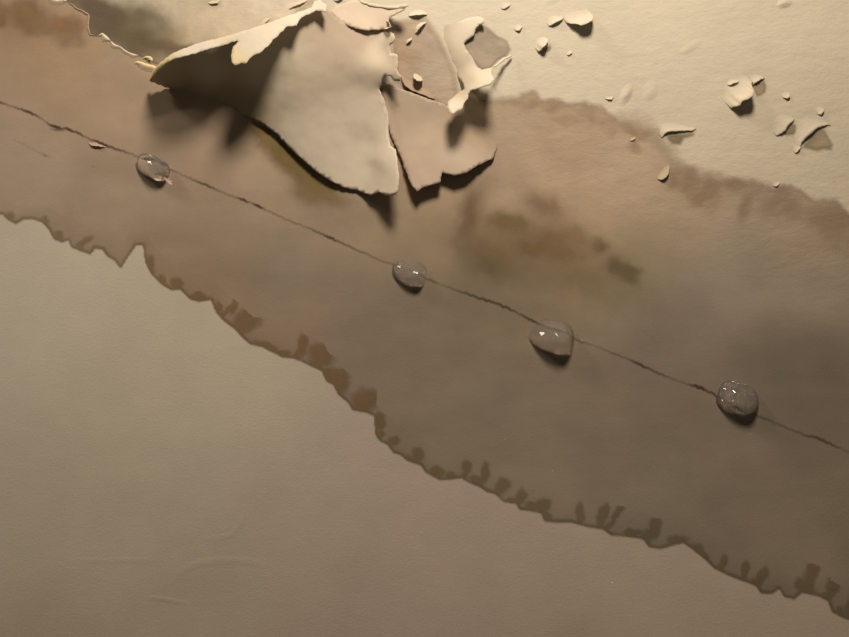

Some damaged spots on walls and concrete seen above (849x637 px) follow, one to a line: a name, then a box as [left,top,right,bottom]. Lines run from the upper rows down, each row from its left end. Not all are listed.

peeling [48,0,513,196]
peeling [724,74,766,108]
crack [50,124,115,149]
peeling [659,123,696,143]
peeling [773,107,831,153]
peeling [657,165,670,180]
water stain [189,292,257,341]
crack [477,297,537,323]
water stain [311,345,348,401]
water stain [349,392,376,412]
water stain [508,492,552,521]
water stain [796,564,849,619]